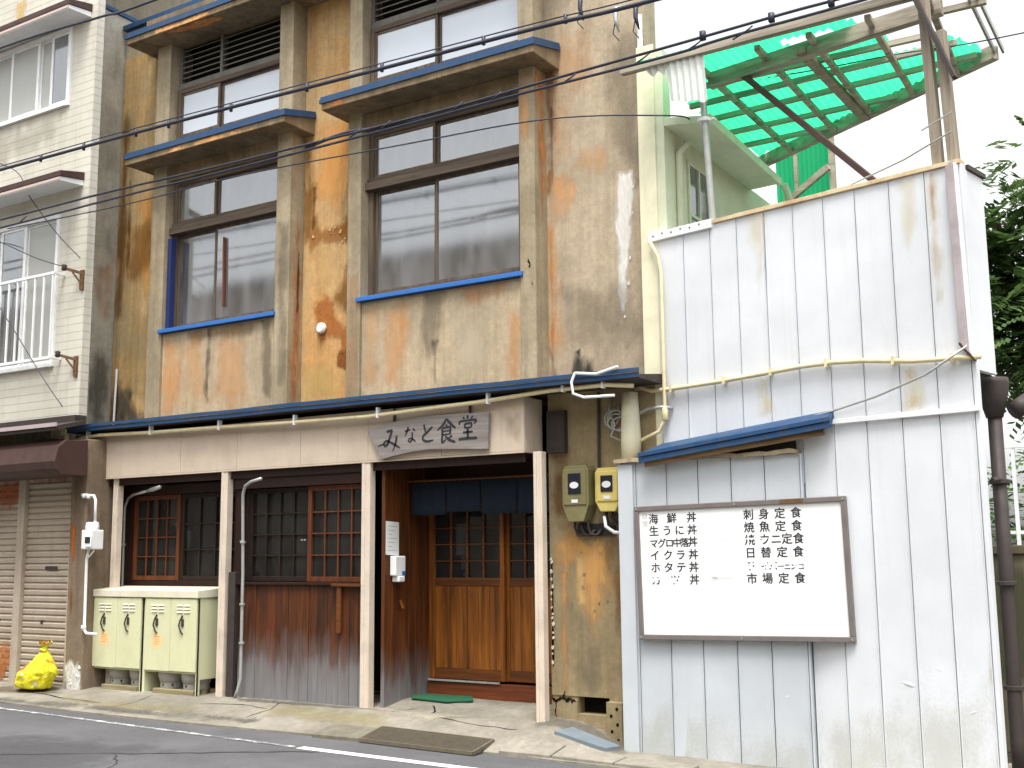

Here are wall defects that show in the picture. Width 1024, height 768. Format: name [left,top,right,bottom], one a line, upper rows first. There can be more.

corrosion [536,73,553,164]
corrosion [117,123,130,303]
corrosion [315,298,346,369]
leakage [572,350,592,378]